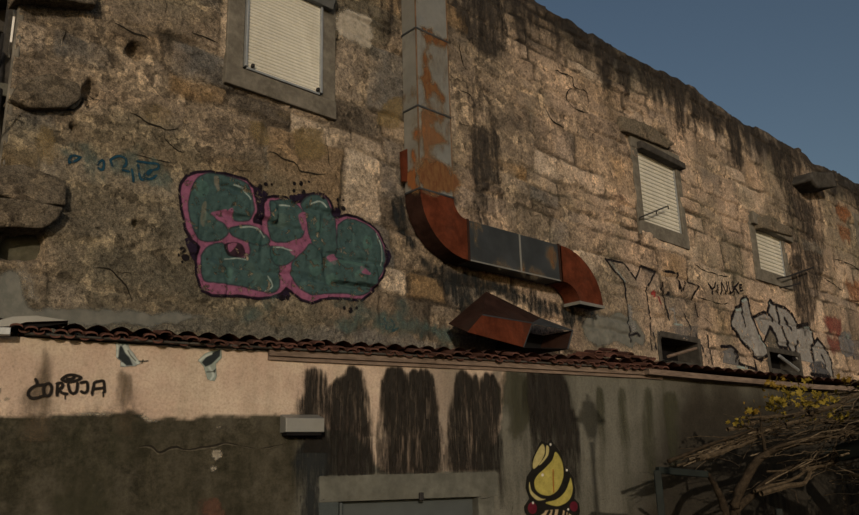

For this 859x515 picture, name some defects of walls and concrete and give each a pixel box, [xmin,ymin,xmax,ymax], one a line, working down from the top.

damp [452,0,517,57]
rust [402,27,461,196]
damp [467,91,501,226]
damp [294,366,581,515]